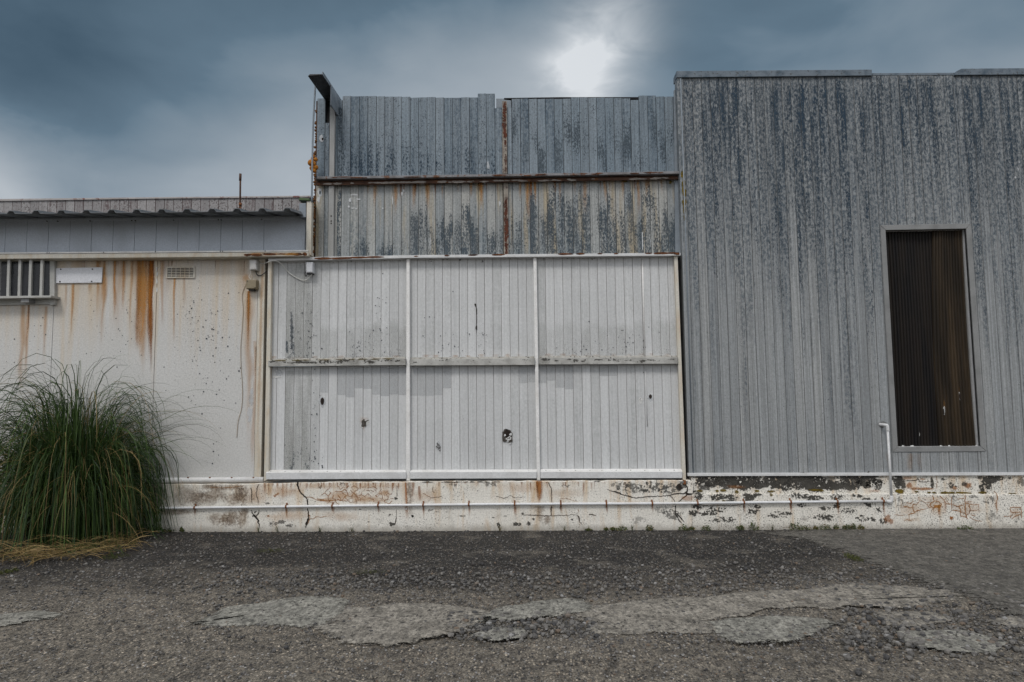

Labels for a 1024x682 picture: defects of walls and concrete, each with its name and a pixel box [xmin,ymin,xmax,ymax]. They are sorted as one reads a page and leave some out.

rust [493,102,507,176]
rust [492,199,509,256]
water stain [333,75,1024,313]
rust [136,260,154,341]
crack [296,482,398,528]
crack [607,489,744,523]